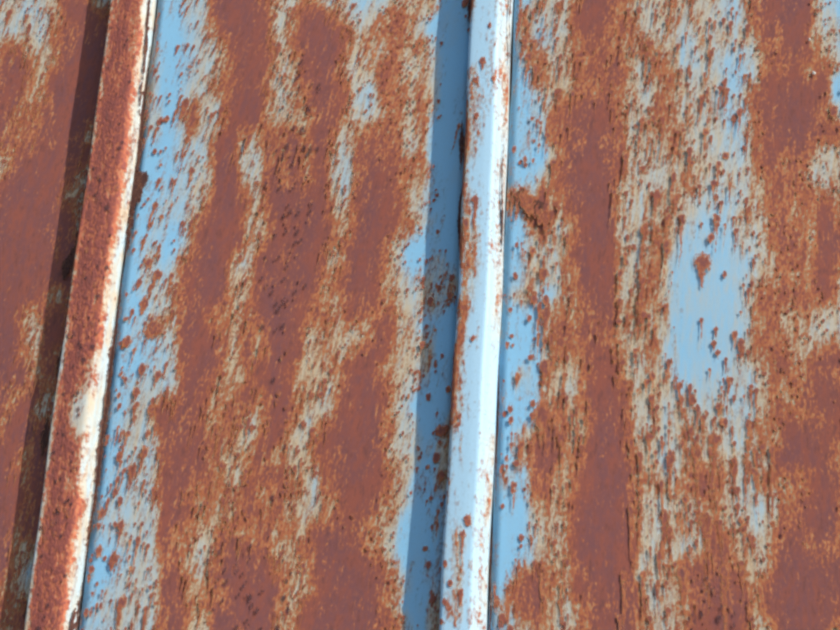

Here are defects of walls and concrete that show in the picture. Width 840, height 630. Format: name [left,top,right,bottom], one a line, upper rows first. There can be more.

peeling [0,0,110,248]
peeling [307,0,417,226]
corrosion [424,0,840,630]